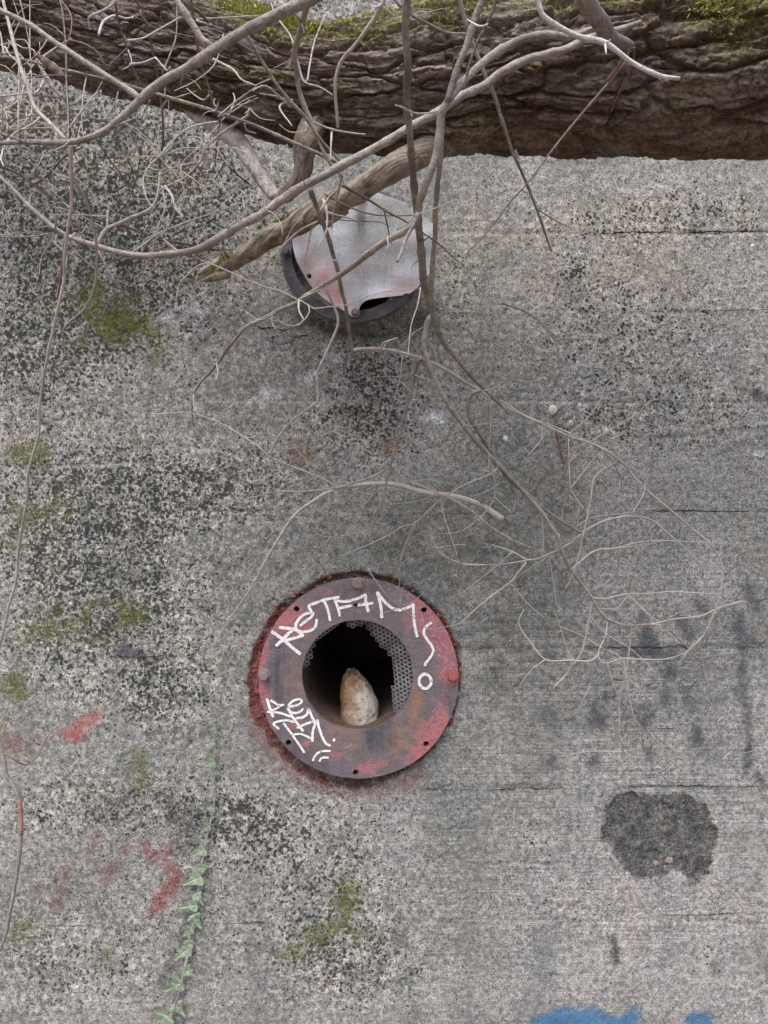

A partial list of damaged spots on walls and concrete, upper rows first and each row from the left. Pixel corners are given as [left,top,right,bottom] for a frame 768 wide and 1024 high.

crack [577,230,768,239]
crack [654,507,764,515]